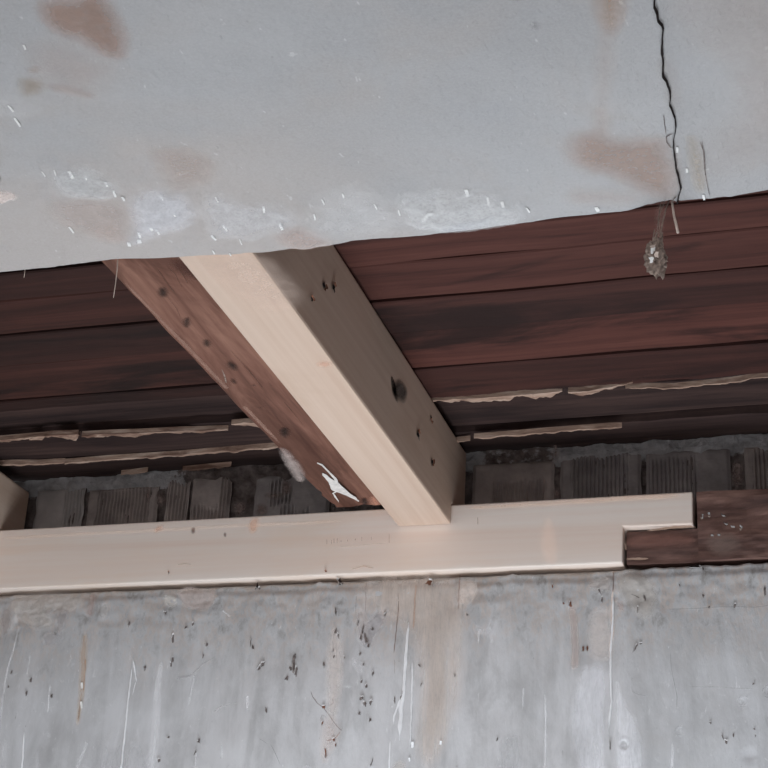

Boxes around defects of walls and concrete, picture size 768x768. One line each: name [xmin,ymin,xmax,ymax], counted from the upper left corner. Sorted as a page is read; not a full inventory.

water stain [50,0,117,52]
crack [653,0,682,204]
crack [700,141,710,196]